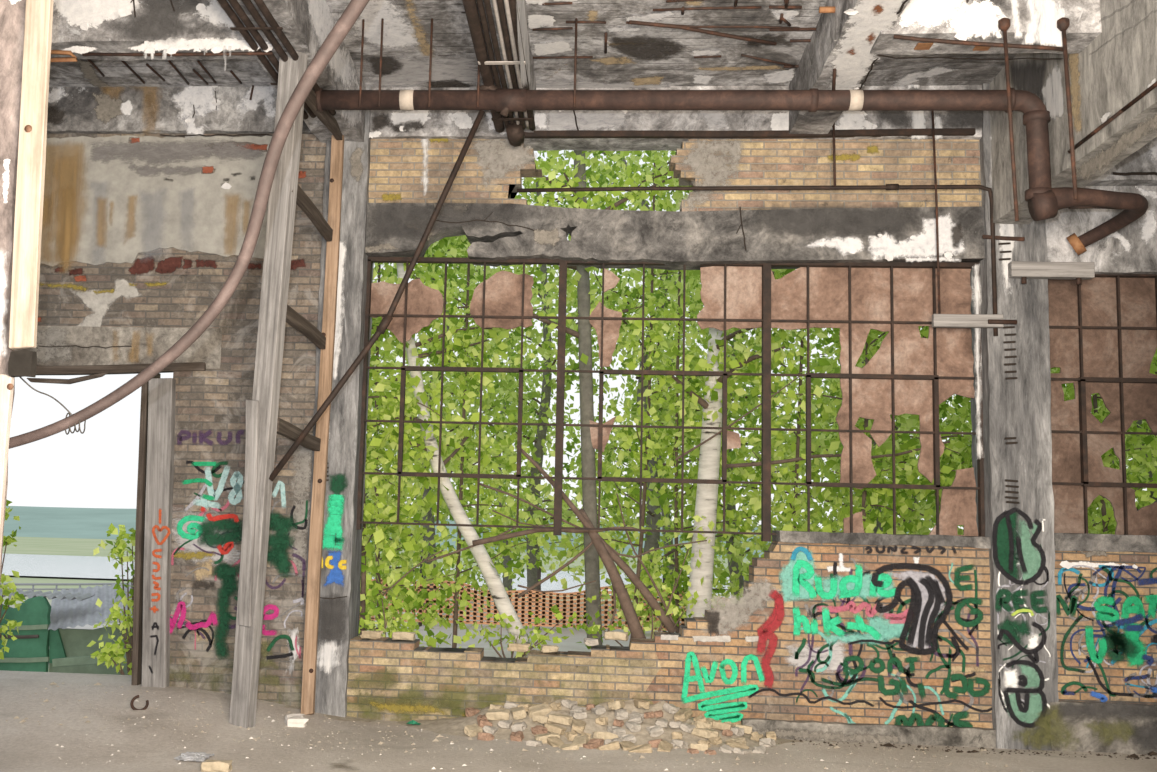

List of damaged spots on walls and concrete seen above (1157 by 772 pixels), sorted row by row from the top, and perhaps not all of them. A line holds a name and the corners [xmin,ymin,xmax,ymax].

peeling [53,0,273,85]
spalling [525,0,816,68]
peeling [828,0,1063,90]
spalling [92,93,124,124]
spalling [951,225,963,248]
spalling [55,267,86,282]
spalling [128,256,217,275]
spalling [290,259,306,270]